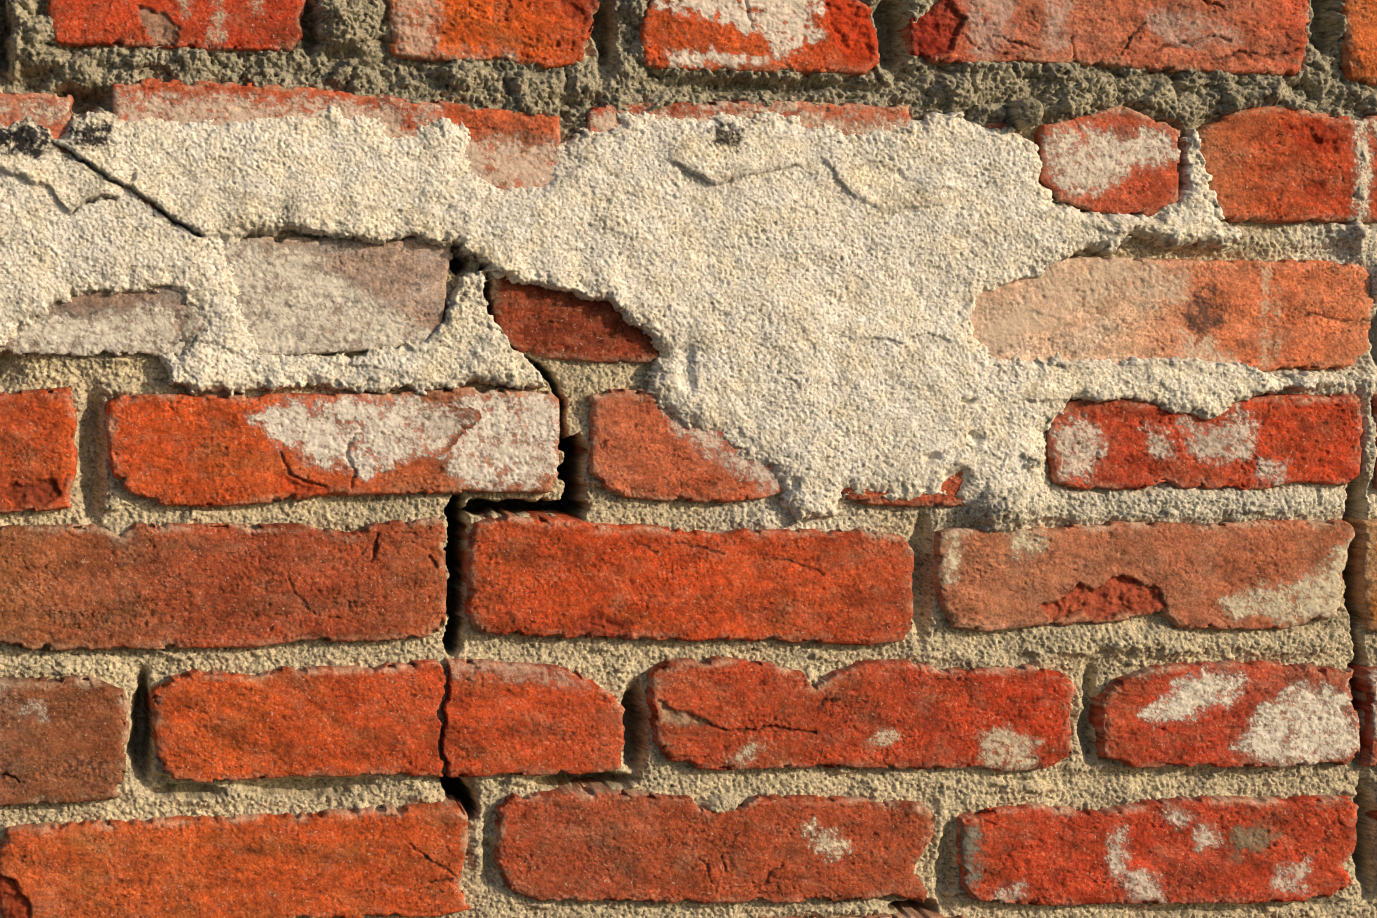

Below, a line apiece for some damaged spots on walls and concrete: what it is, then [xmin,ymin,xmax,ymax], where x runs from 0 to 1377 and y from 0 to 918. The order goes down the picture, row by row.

peeling [654,0,879,70]
flaking render [0,117,493,259]
flaking render [671,132,810,182]
water stain [1040,121,1181,198]
crack [450,258,460,273]
flaking render [426,285,534,387]
flaking render [1028,365,1266,415]
water stain [248,389,559,492]
crack [434,435,570,647]
water stain [1137,666,1248,723]
water stain [1231,671,1377,767]
crack [440,774,471,809]